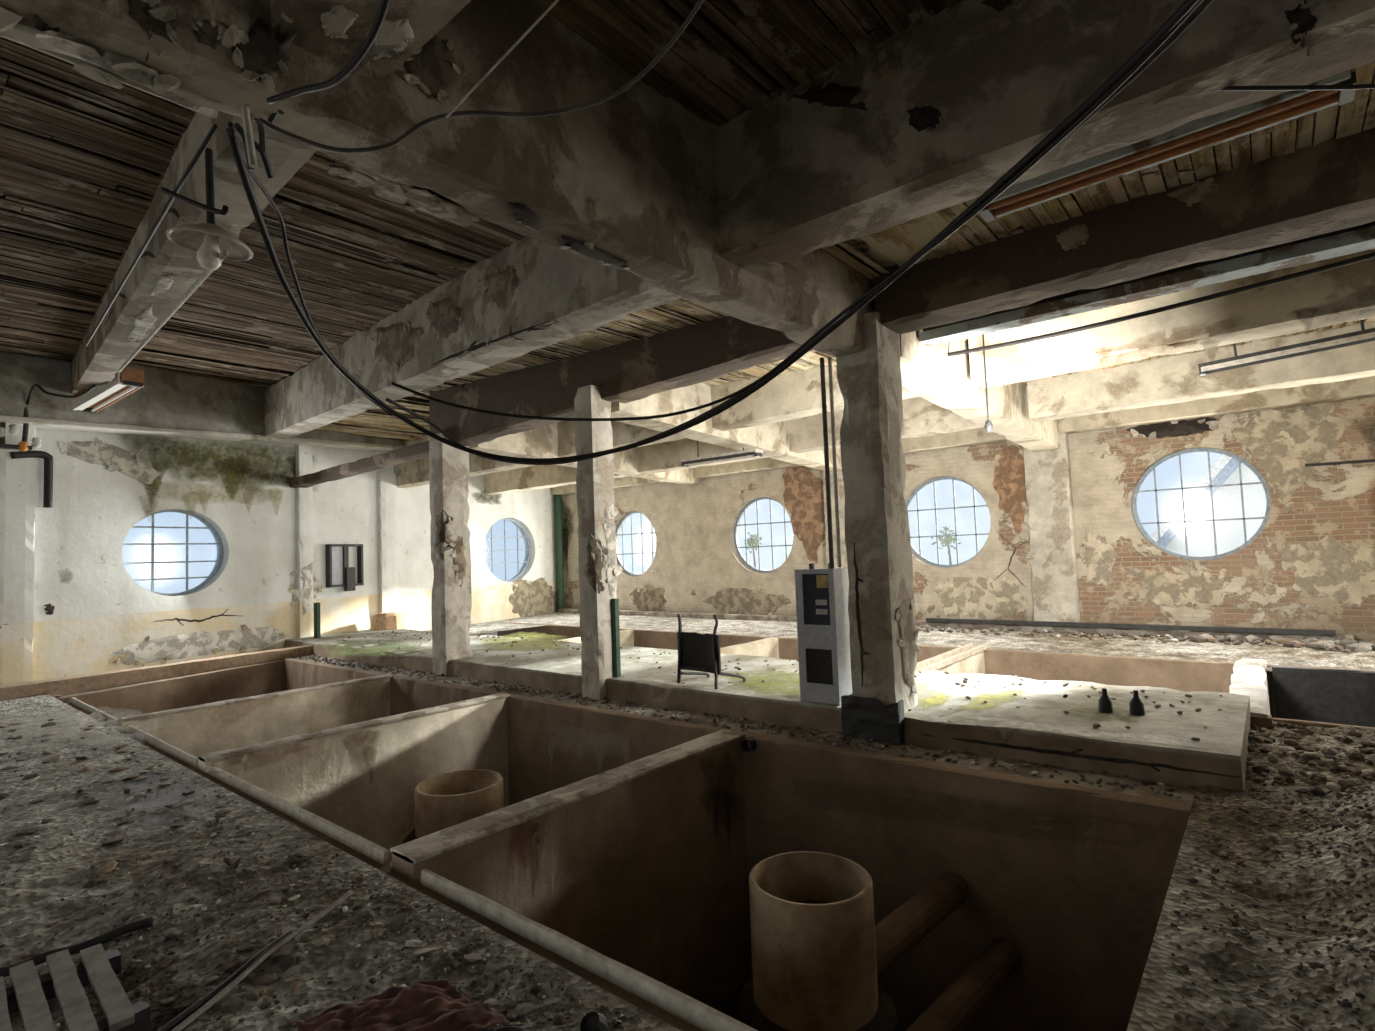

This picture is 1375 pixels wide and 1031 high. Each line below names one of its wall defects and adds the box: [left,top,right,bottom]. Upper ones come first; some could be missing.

peeling [0,0,301,118]
spalling [321,4,462,103]
spalling [1284,0,1317,56]
water stain [130,434,296,513]
spalling [782,466,826,564]
spalling [992,445,1028,534]
peeling [1126,402,1345,513]
crack [153,609,238,626]
peeling [109,624,290,667]
peeling [289,561,323,617]
peeling [1277,535,1375,608]